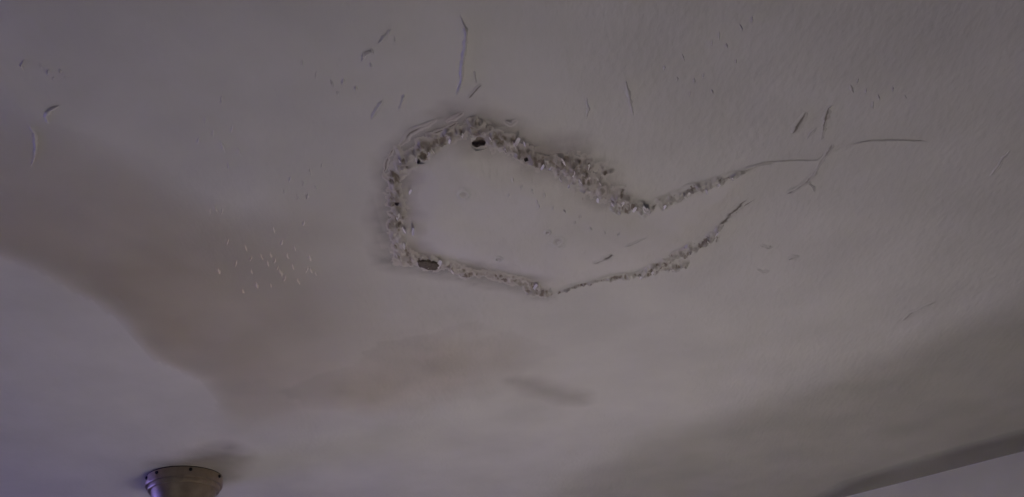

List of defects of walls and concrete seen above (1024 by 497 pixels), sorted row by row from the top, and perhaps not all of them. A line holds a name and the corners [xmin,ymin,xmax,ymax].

crack [556,105,930,294]